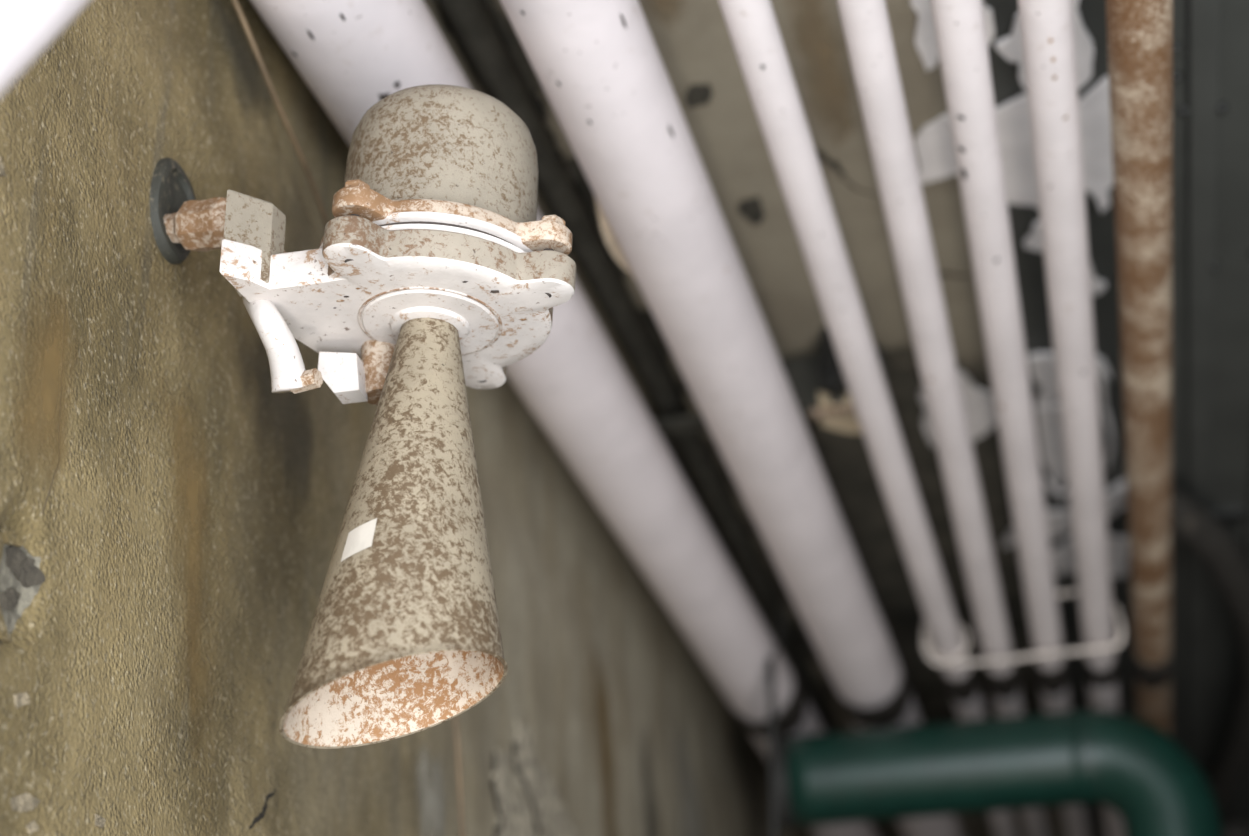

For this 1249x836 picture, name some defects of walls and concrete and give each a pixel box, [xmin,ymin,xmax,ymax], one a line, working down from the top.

peeling [910,0,939,71]
peeling [914,113,967,184]
peeling [982,0,1043,252]
peeling [1063,0,1113,213]
peeling [1090,263,1106,295]
spalling [0,522,46,645]
flaking render [491,719,579,836]